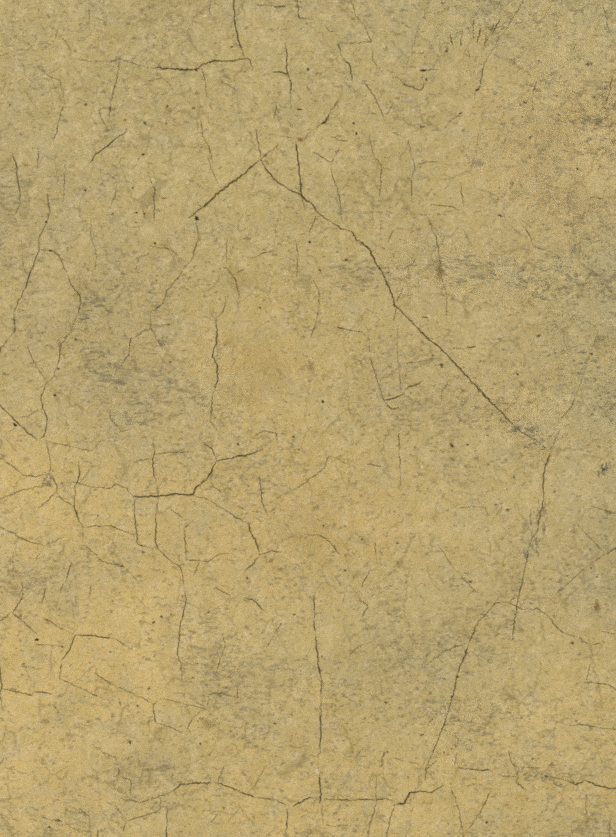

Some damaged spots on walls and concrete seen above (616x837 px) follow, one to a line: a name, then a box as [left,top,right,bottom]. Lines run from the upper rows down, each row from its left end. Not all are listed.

crack [91,0,251,161]
crack [274,49,299,116]
crack [0,206,81,350]
crack [114,104,574,533]
crack [0,245,278,679]
crack [0,564,226,732]
crack [102,556,615,837]